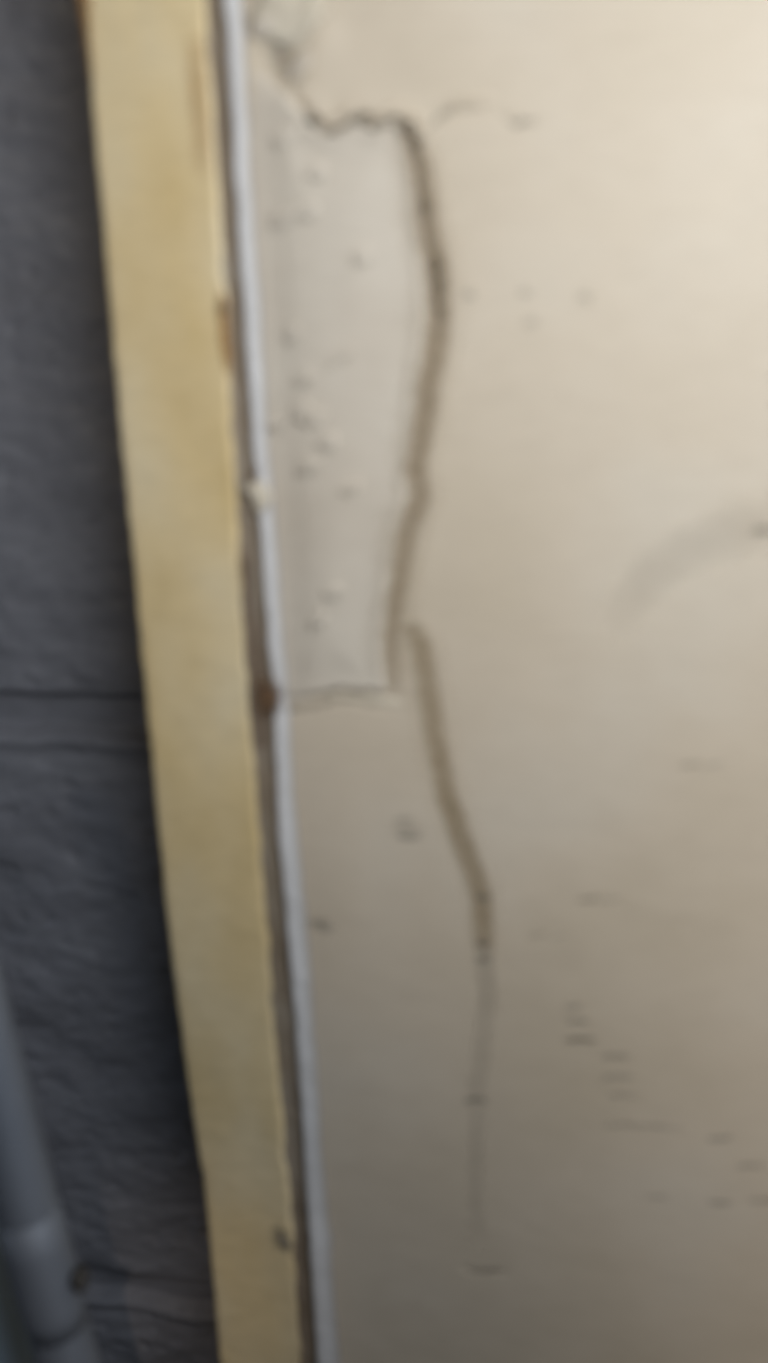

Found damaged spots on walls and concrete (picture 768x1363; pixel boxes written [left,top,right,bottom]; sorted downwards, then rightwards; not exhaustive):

crack [306,103,429,144]